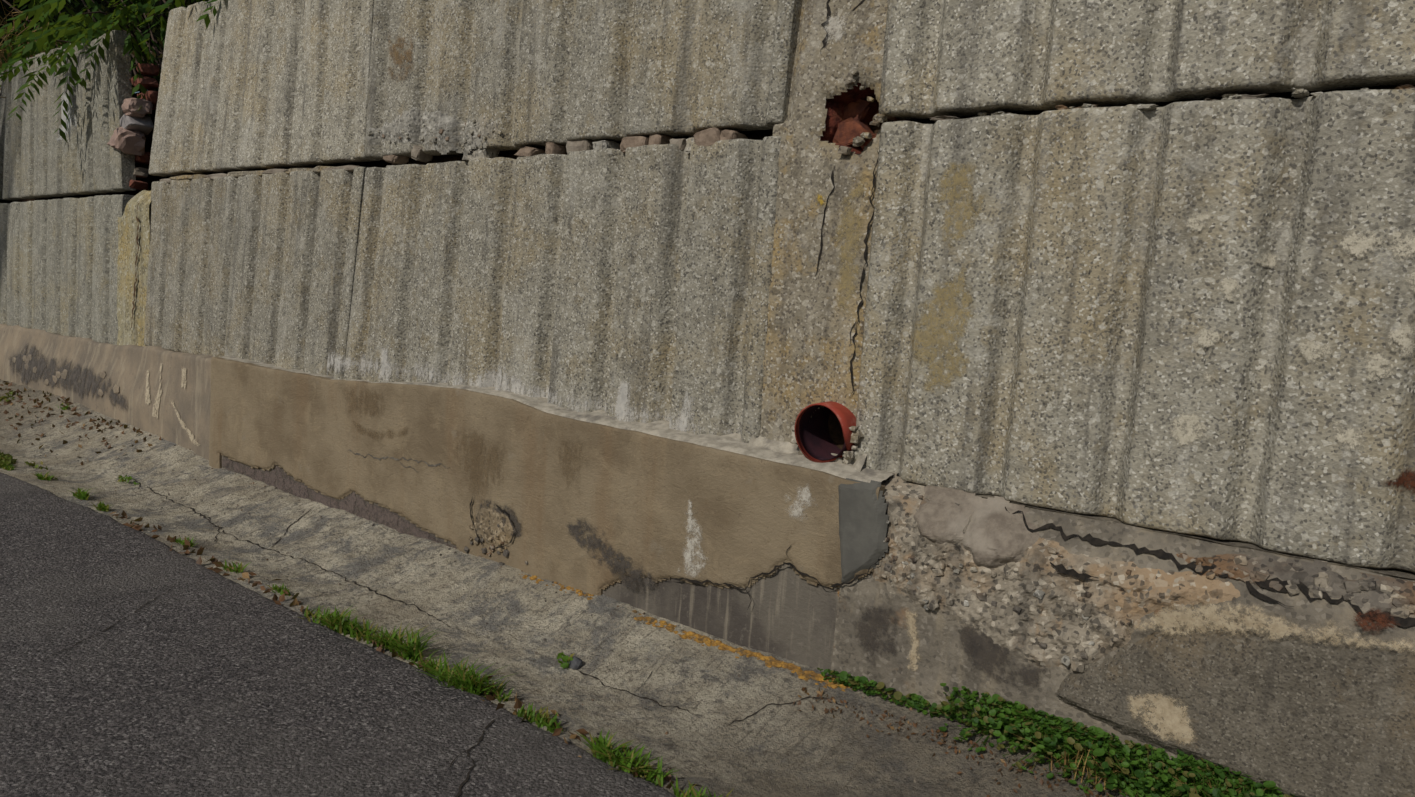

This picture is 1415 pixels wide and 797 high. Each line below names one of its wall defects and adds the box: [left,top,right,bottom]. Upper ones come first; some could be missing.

spalling [820,70,910,155]
corrosion [1385,469,1415,493]
water stain [684,502,705,575]
spalling [661,473,1415,672]
crack [1005,507,1415,628]
crack [577,669,842,725]
crack [446,717,499,797]